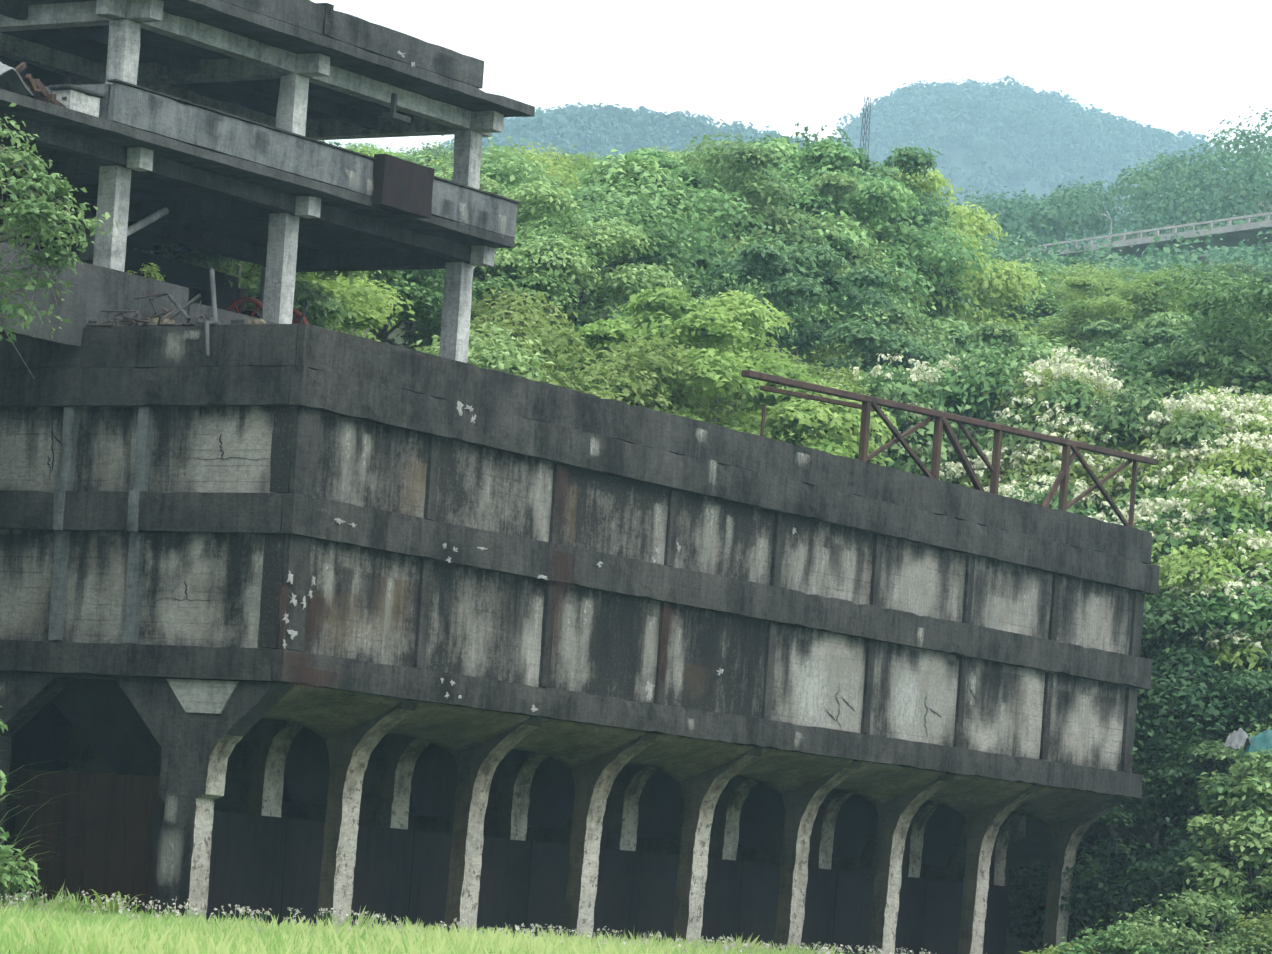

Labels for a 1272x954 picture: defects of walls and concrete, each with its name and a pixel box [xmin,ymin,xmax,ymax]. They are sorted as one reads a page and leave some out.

spalling [456,401,476,423]
crack [187,434,266,460]
damp [706,507,731,555]
spalling [442,543,461,563]
damp [799,540,864,583]
spalling [282,570,316,649]
damp [784,636,809,691]
crack [825,685,855,728]